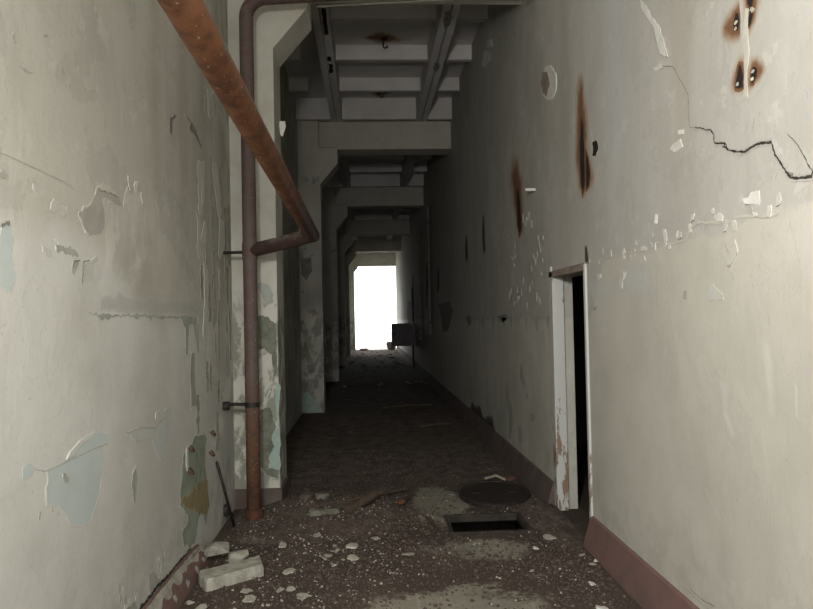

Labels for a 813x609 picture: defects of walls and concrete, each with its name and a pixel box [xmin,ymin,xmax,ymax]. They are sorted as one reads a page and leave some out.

rust [353,29,422,45]
rust [571,57,600,210]
crack [640,0,813,182]
rust [718,0,769,106]
peeling [0,221,16,292]
peeling [32,176,144,236]
rust [508,141,526,247]
peeling [589,190,781,268]
peeling [146,142,231,609]
peeling [258,315,281,478]
peeling [302,392,322,413]
peeling [22,431,111,528]